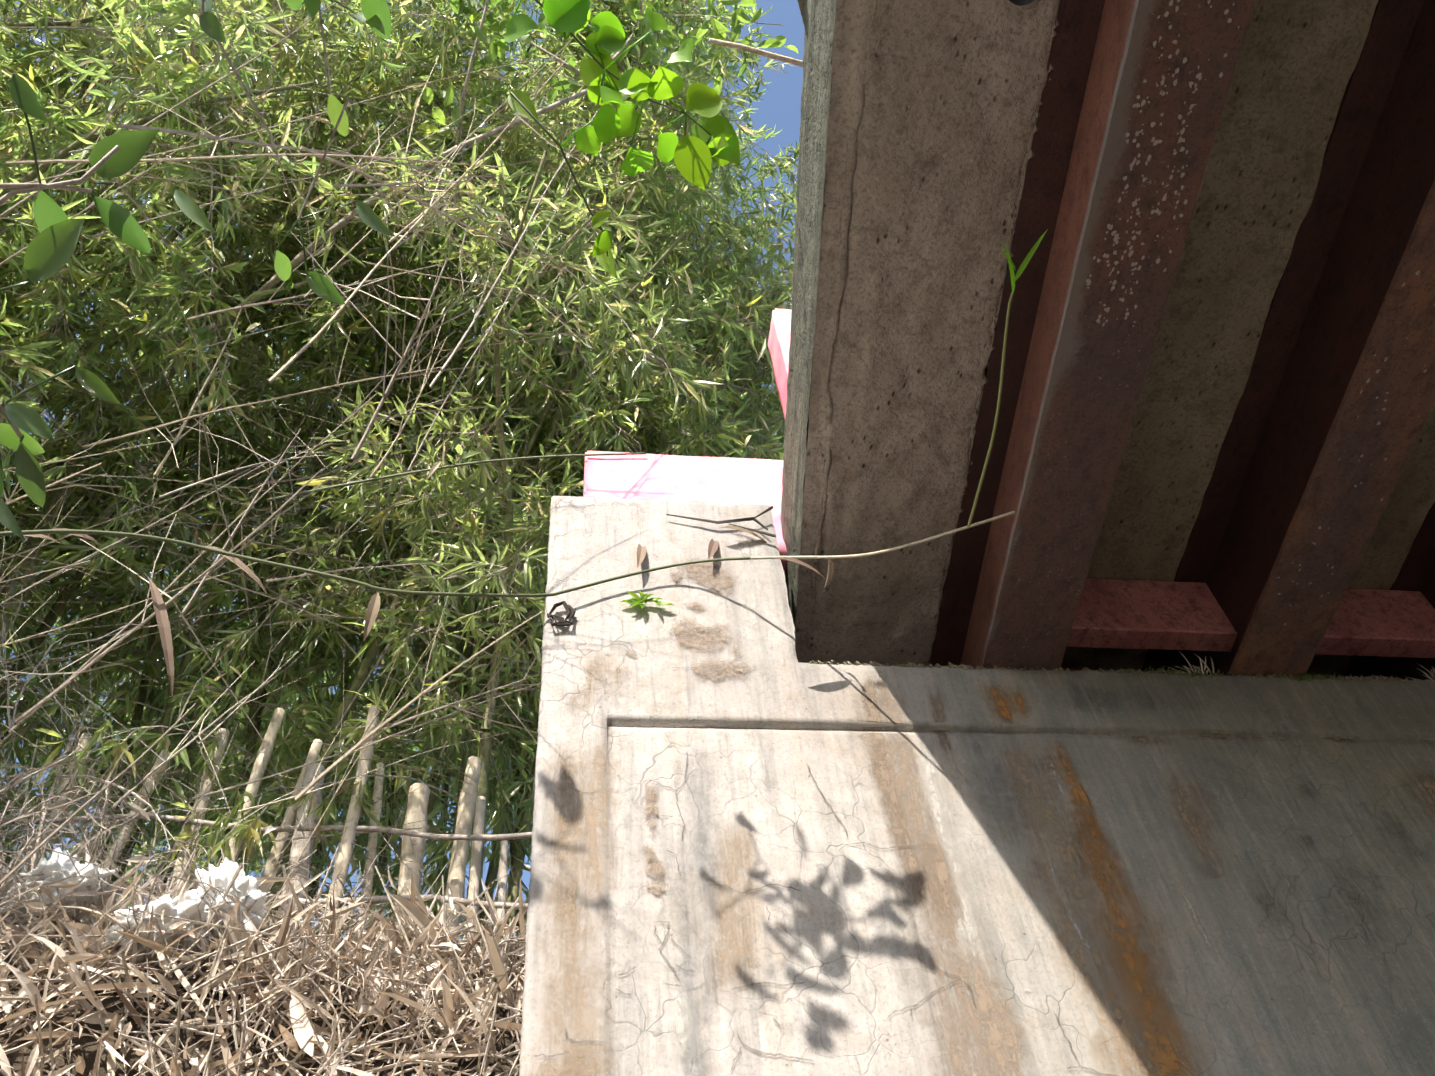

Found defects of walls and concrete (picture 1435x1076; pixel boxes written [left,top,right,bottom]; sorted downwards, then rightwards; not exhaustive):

corrosion [858,680,1027,1076]